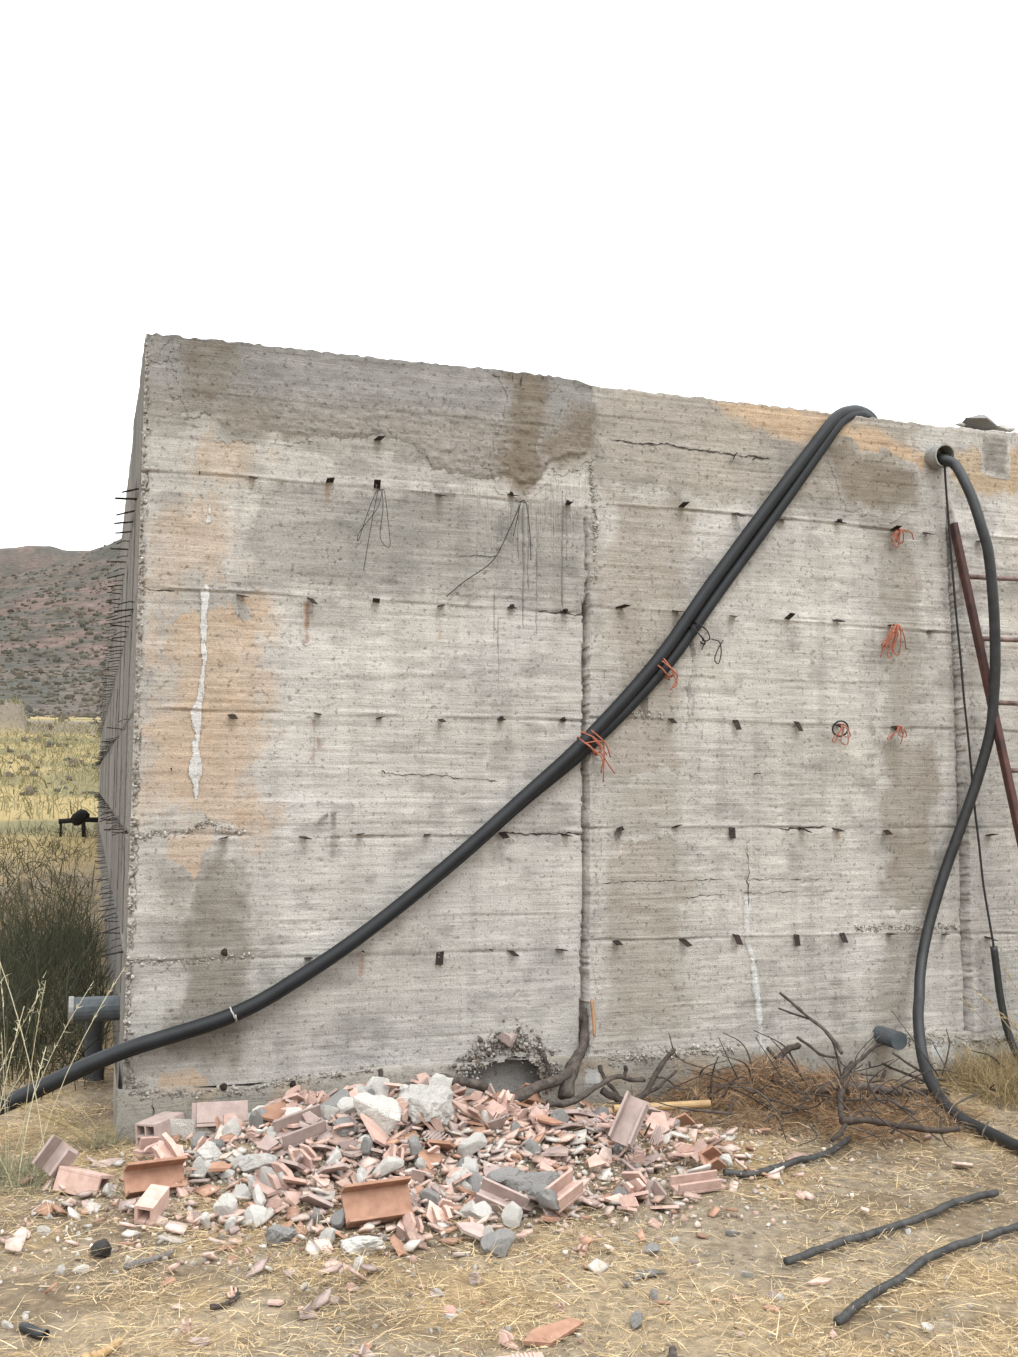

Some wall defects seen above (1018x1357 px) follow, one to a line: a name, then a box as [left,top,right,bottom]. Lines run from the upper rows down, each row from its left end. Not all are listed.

water stain [99,334,313,1102]
water stain [463,370,706,724]
water stain [582,626,709,1090]